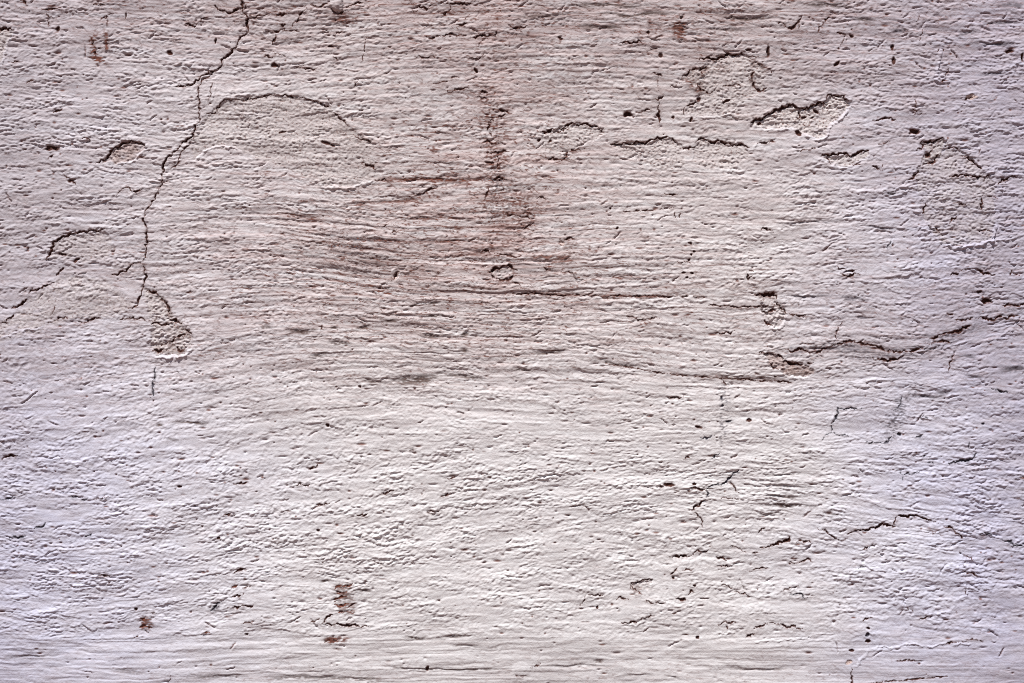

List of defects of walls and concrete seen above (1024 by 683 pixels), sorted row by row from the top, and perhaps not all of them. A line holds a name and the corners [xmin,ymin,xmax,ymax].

spalling [96,140,147,166]
crack [112,0,307,309]
spalling [537,94,888,171]
crack [787,303,1024,362]
crack [765,514,1024,594]